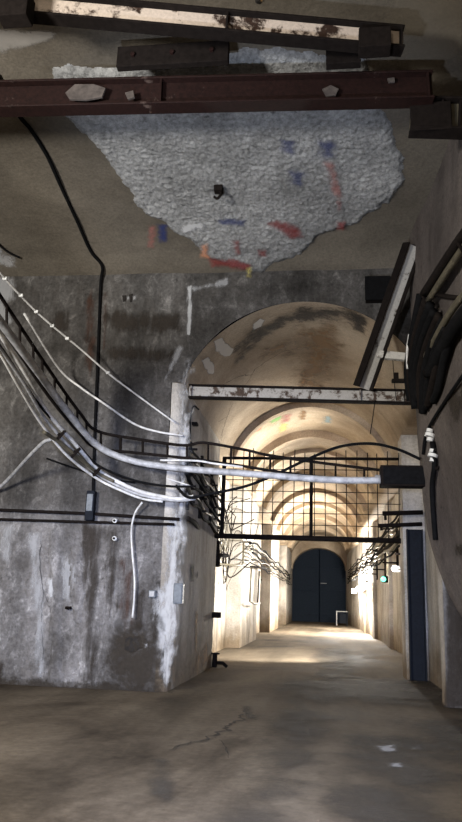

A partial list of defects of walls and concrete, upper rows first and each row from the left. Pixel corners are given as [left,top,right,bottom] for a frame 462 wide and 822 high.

water stain [179,391,189,465]
water stain [0,482,185,692]
crack [171,706,266,758]